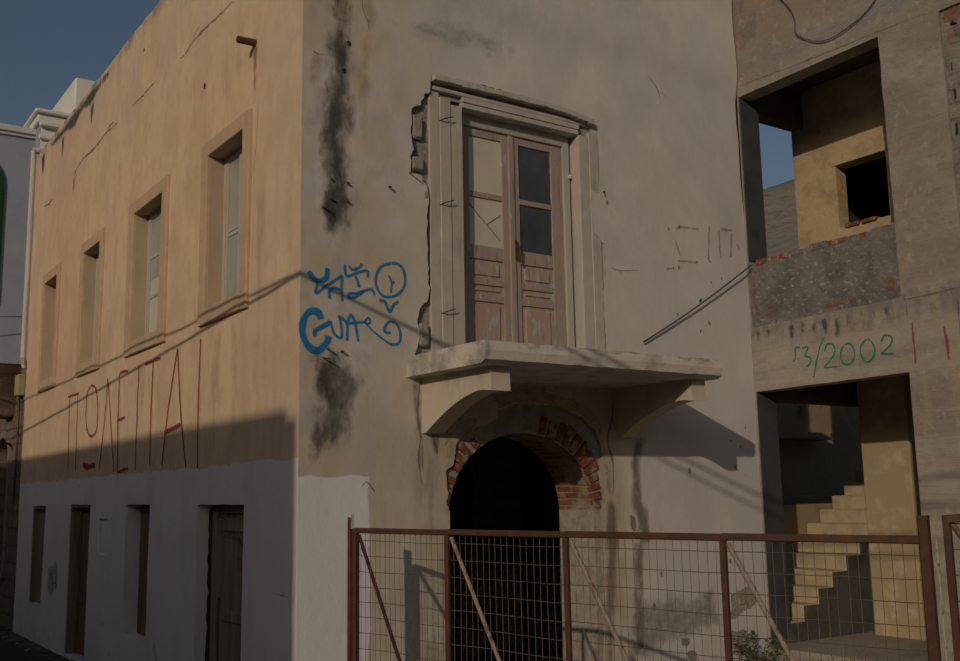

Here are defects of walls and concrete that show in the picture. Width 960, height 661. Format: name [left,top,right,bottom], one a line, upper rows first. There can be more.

crack [181,2,232,58]
leakage [325,31,351,225]
spalling [410,83,564,199]
spalling [415,297,430,355]
leakage [319,362,354,439]